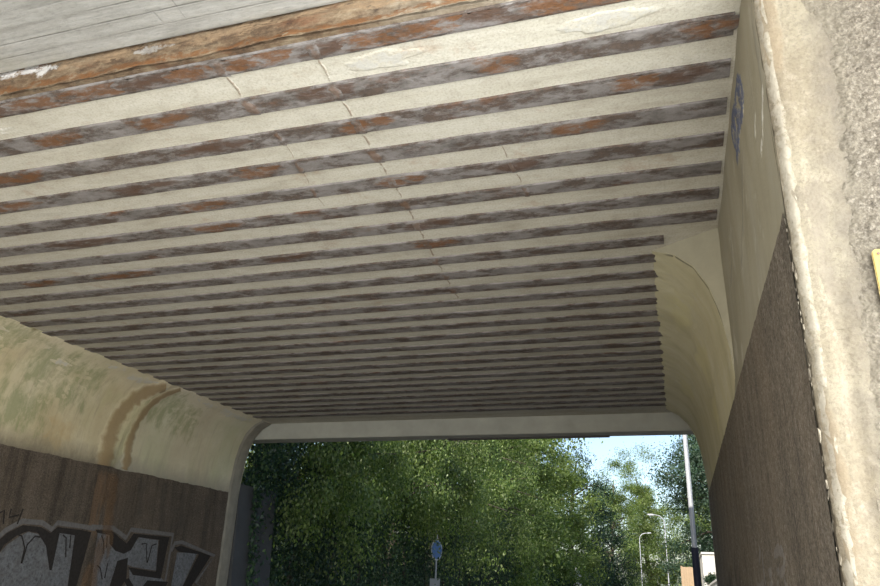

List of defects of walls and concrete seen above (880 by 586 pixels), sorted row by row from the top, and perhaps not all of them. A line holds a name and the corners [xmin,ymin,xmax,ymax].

spalling [0,0,423,81]
corrosion [604,63,721,94]
corrosion [673,14,740,41]
corrosion [0,0,627,299]